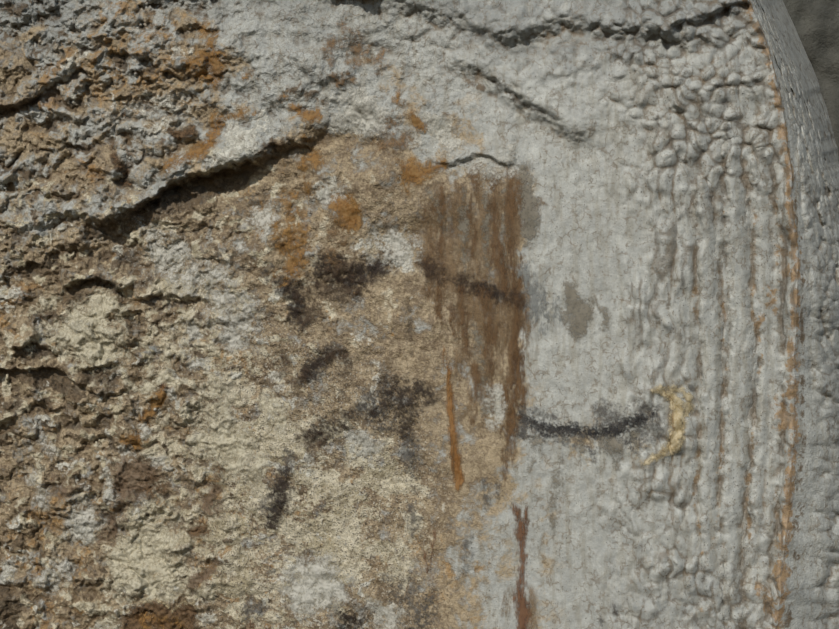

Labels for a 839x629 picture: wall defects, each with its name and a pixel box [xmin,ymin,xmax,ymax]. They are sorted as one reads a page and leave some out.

corrosion [322,22,386,87]
corrosion [373,112,448,192]
corrosion [412,163,530,490]
corrosion [504,504,536,629]